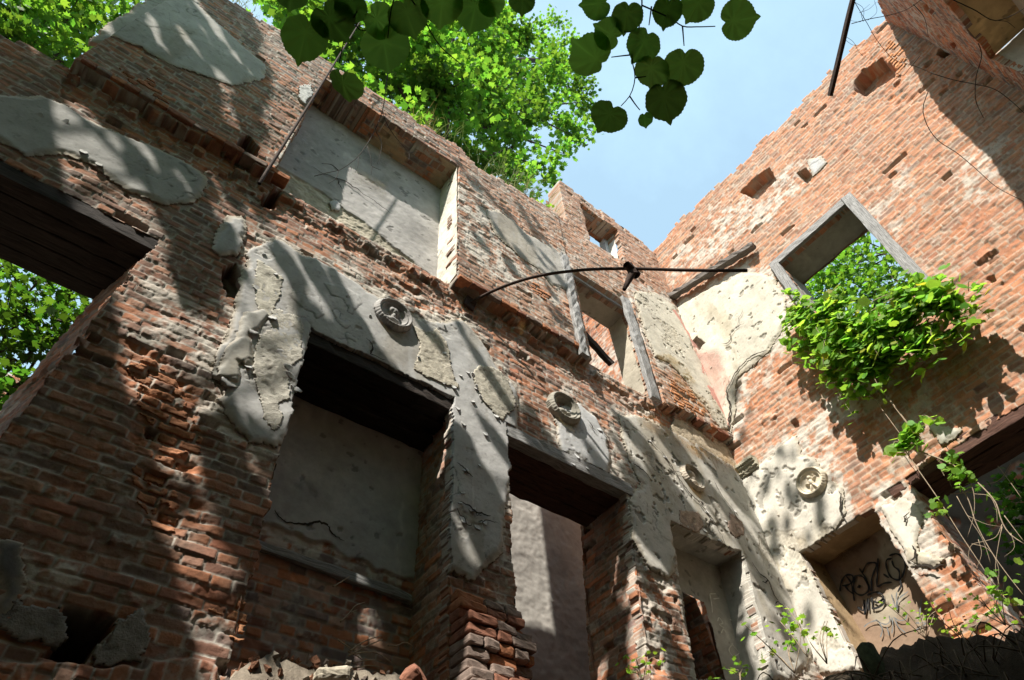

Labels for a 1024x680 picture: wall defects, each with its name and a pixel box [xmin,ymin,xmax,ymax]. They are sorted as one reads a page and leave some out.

peeling [245,253,304,431]
peeling [413,324,516,421]
crack [724,310,765,445]
crack [275,511,344,541]
crack [457,501,493,526]